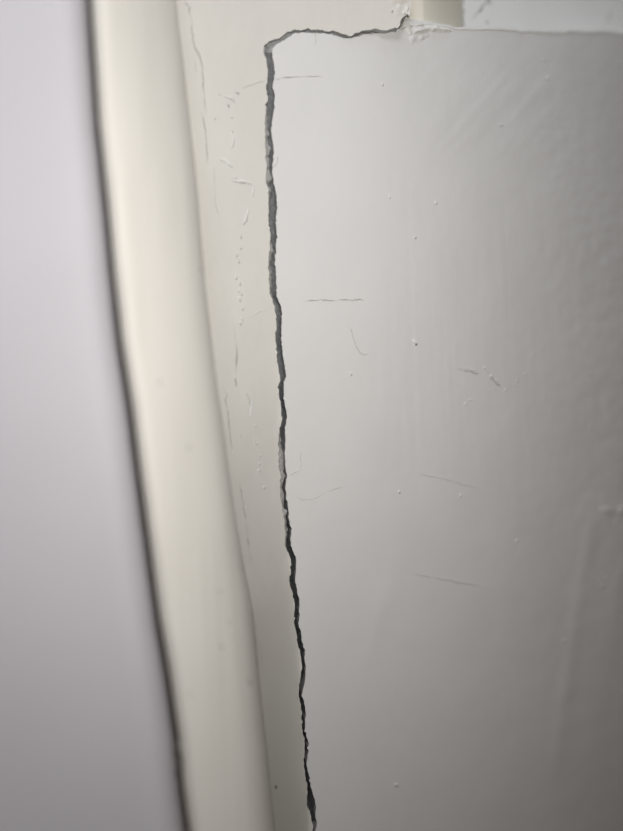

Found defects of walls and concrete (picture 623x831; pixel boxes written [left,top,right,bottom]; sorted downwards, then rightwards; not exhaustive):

spalling [384,0,454,44]
crack [242,31,374,821]